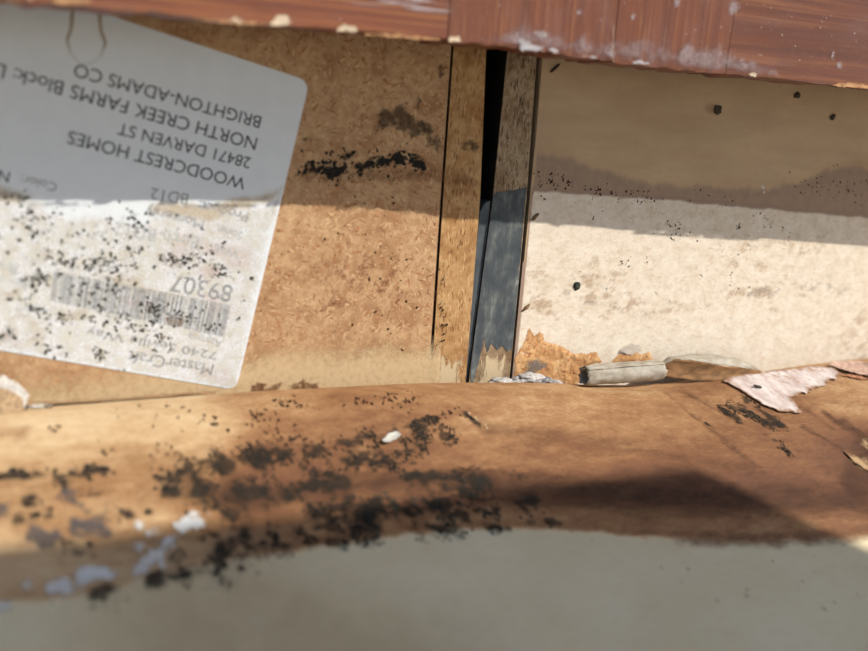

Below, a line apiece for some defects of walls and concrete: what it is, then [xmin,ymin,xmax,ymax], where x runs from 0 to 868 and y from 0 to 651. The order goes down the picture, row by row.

leakage [295,107,438,186]
leakage [0,144,868,612]
peeling [514,328,602,384]
peeling [613,344,868,413]